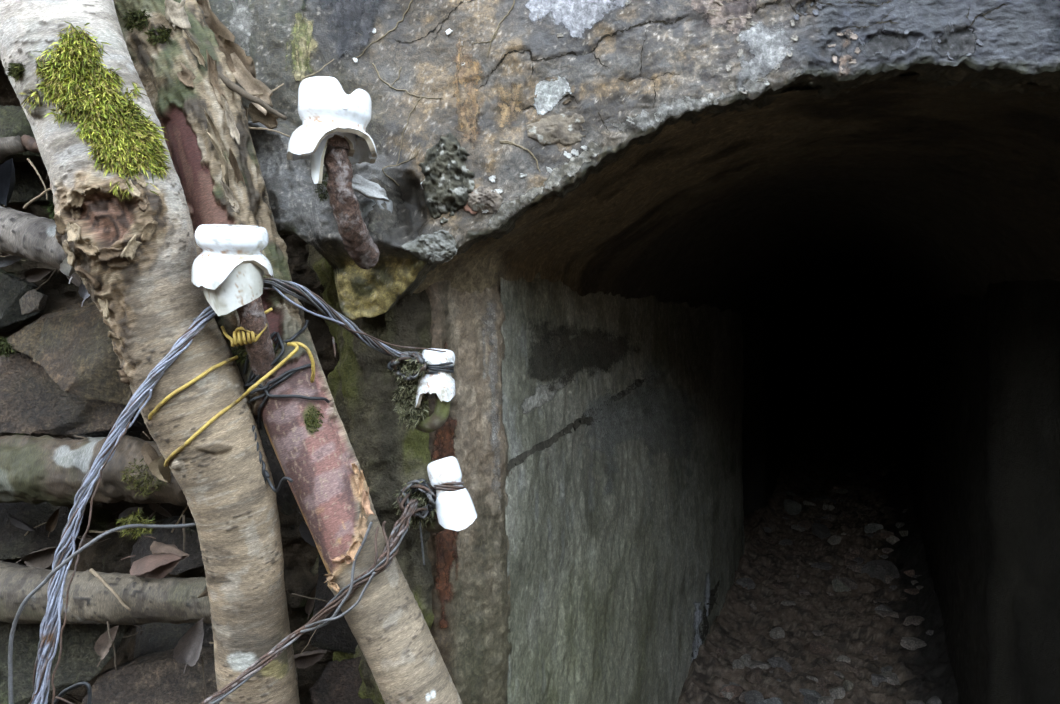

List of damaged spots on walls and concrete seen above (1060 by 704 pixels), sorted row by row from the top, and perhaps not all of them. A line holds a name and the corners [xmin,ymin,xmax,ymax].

crack [392,0,474,43]
peeling [525,0,632,38]
crack [479,15,688,108]
crack [522,94,609,131]